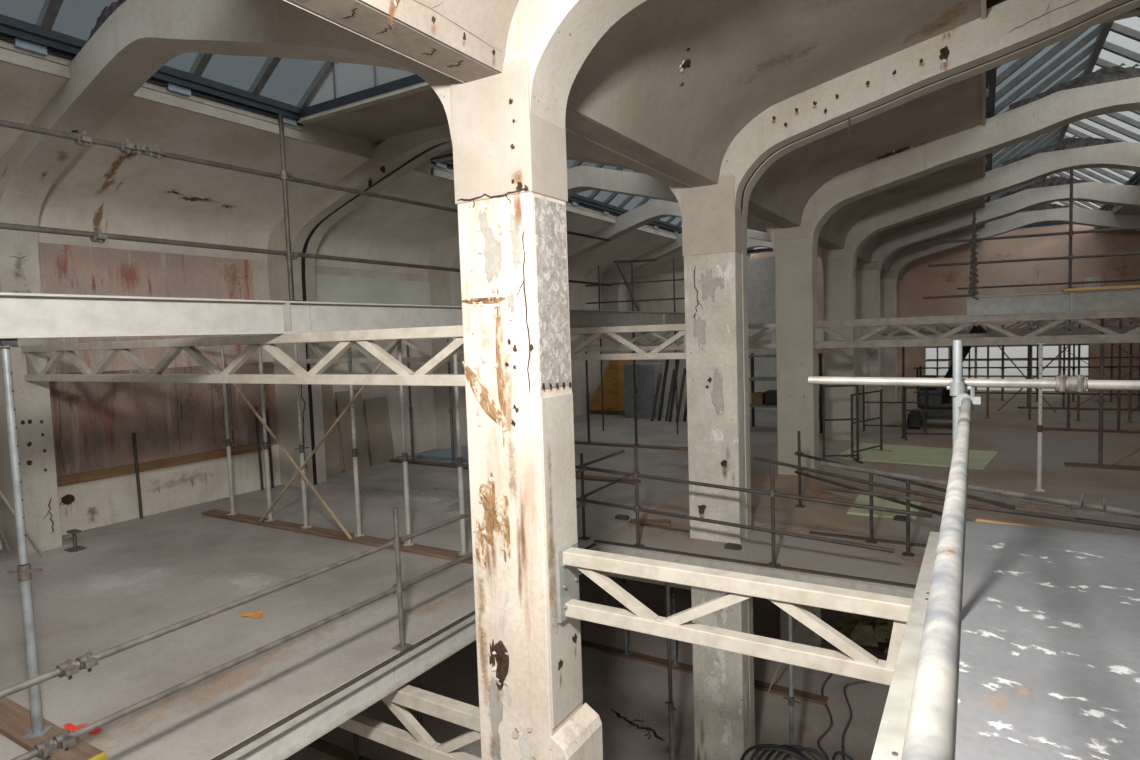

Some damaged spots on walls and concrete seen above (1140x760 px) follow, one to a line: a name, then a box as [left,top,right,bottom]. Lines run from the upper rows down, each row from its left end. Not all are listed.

rust [93,156,125,232]
peeling [466,202,521,320]
spalling [488,640,509,690]